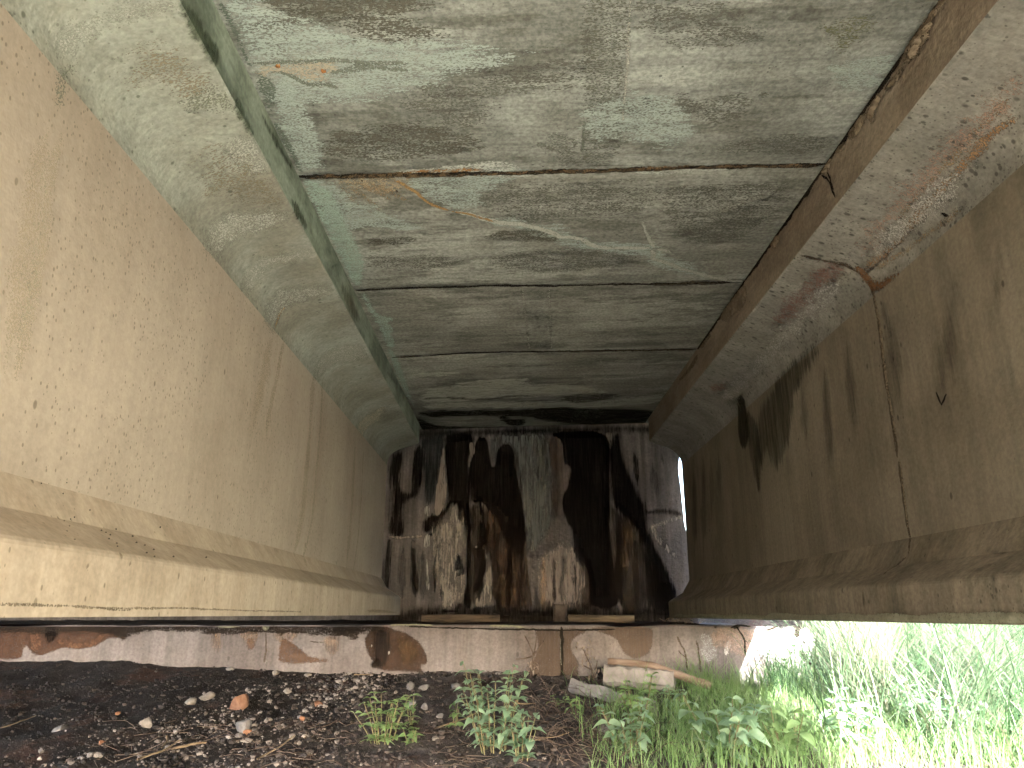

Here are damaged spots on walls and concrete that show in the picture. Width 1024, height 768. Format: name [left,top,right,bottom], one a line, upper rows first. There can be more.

corrosion [330,168,486,214]
water stain [219,0,793,676]
crack [394,50,908,349]